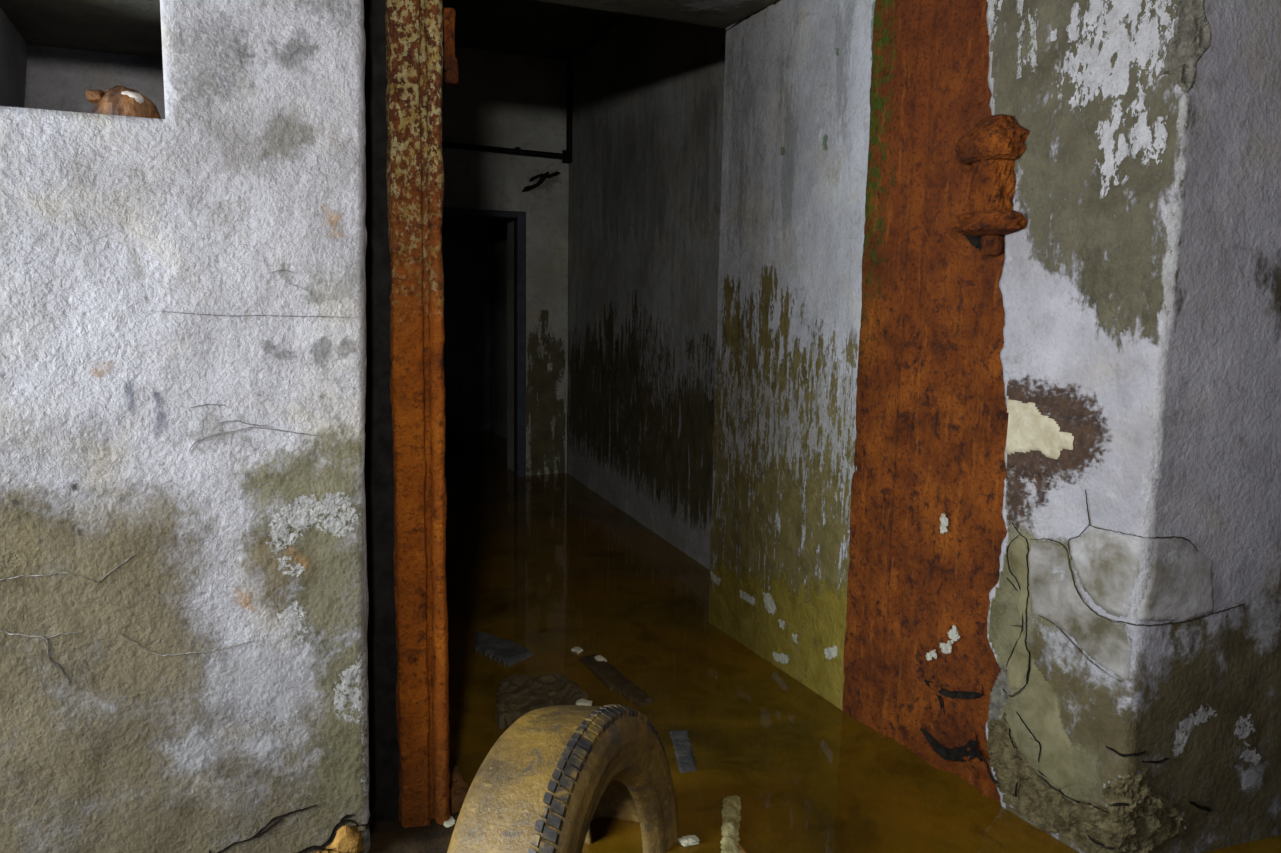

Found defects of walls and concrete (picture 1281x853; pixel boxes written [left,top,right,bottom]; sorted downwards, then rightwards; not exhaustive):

peeling [987,0,1212,197]
damp [1255,251,1281,321]
damp [526,265,858,711]
flaking render [1006,399,1074,459]
damp [0,430,369,853]
damp [987,483,1281,853]
crack [209,805,378,853]